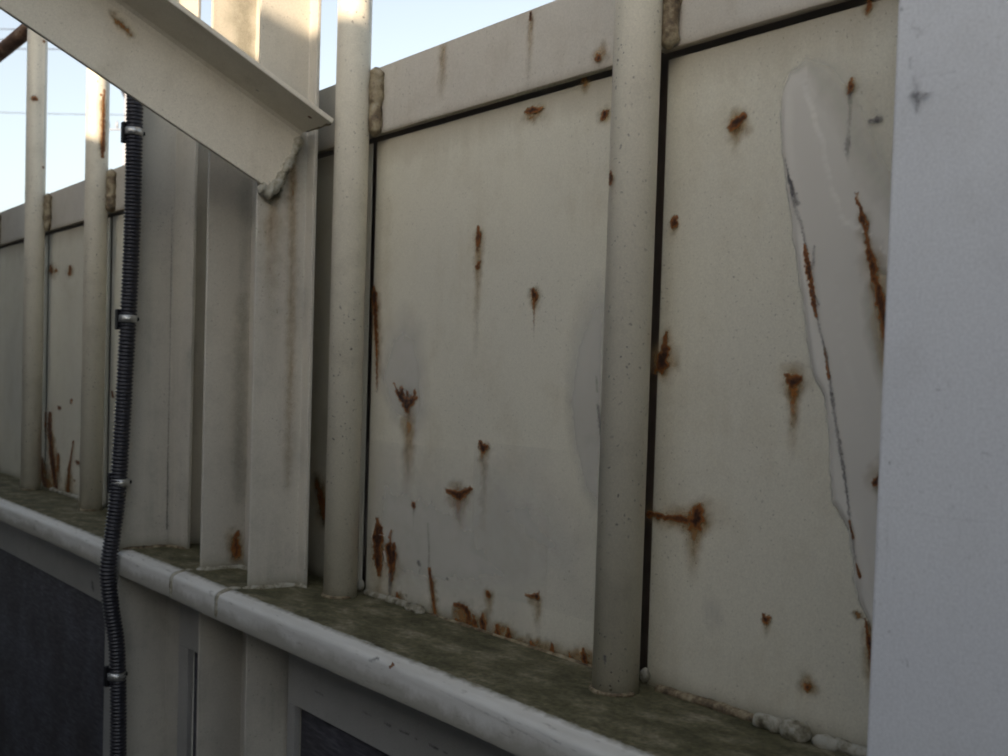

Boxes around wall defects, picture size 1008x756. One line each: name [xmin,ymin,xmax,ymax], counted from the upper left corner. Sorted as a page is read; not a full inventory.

corrosion [524,106,543,120]
corrosion [727,112,747,135]
crack [787,169,798,205]
corrosion [854,192,886,355]
corrosion [654,331,672,375]
crack [803,238,862,578]
corrosion [41,398,80,493]
corrosion [445,486,473,518]
corrosion [453,602,511,638]
corrosion [853,611,872,668]